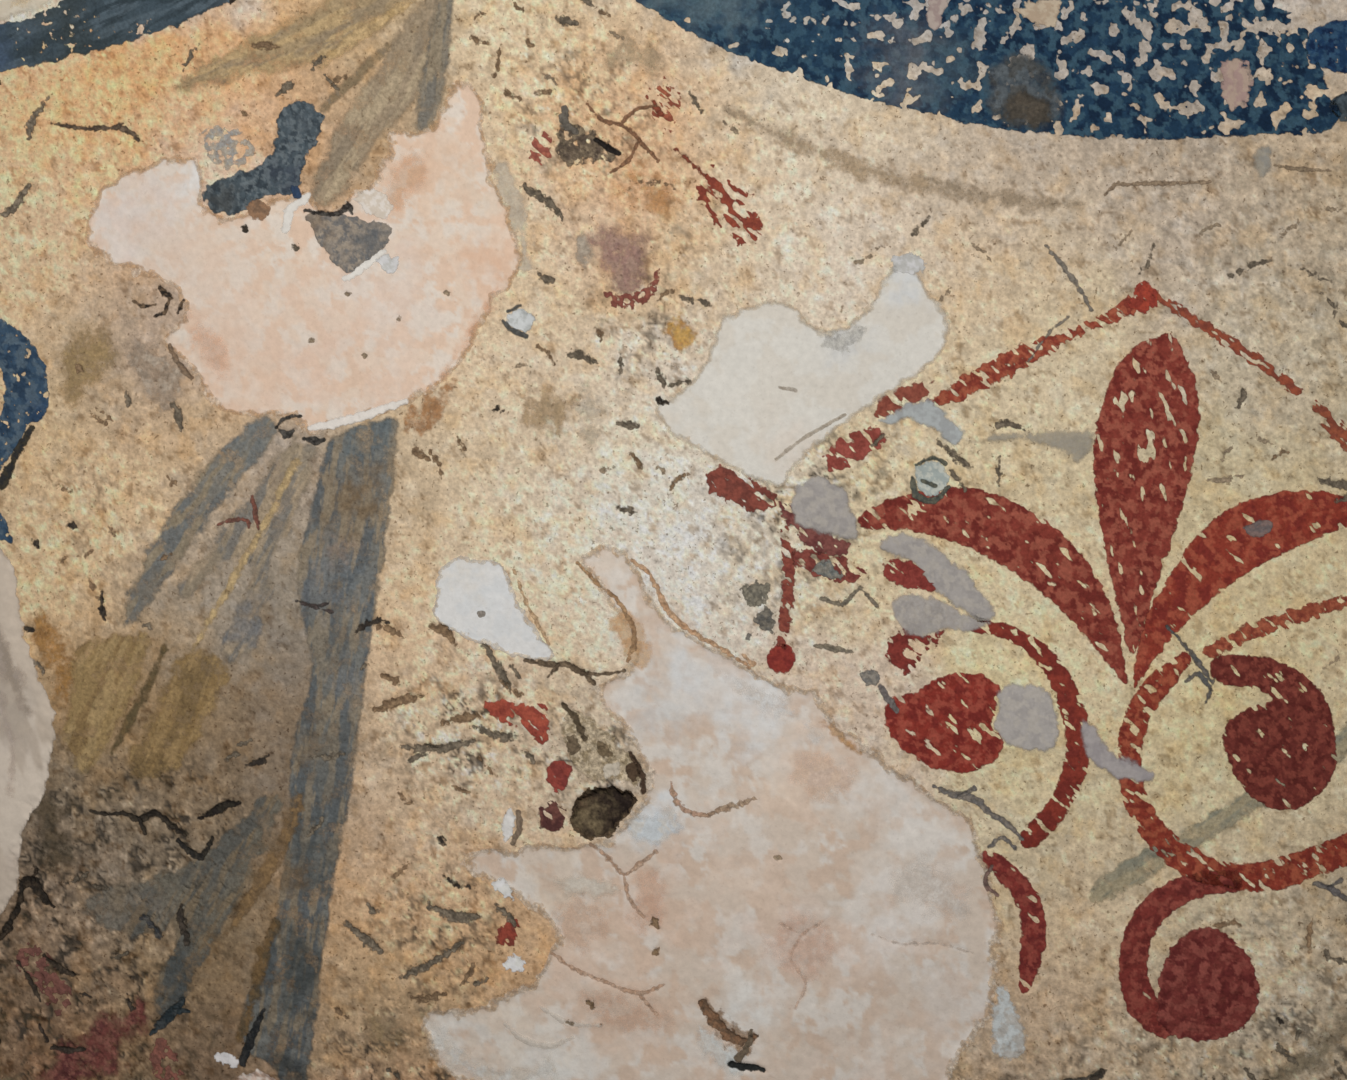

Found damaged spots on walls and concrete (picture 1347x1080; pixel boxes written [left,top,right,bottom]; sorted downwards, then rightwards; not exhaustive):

flaking render [87,80,598,434]
spalling [629,452,690,490]
flaking render [655,246,950,583]
crack [89,800,241,860]
flaking render [399,544,1025,1080]
crack [0,868,86,1054]
flaking render [214,1052,276,1080]